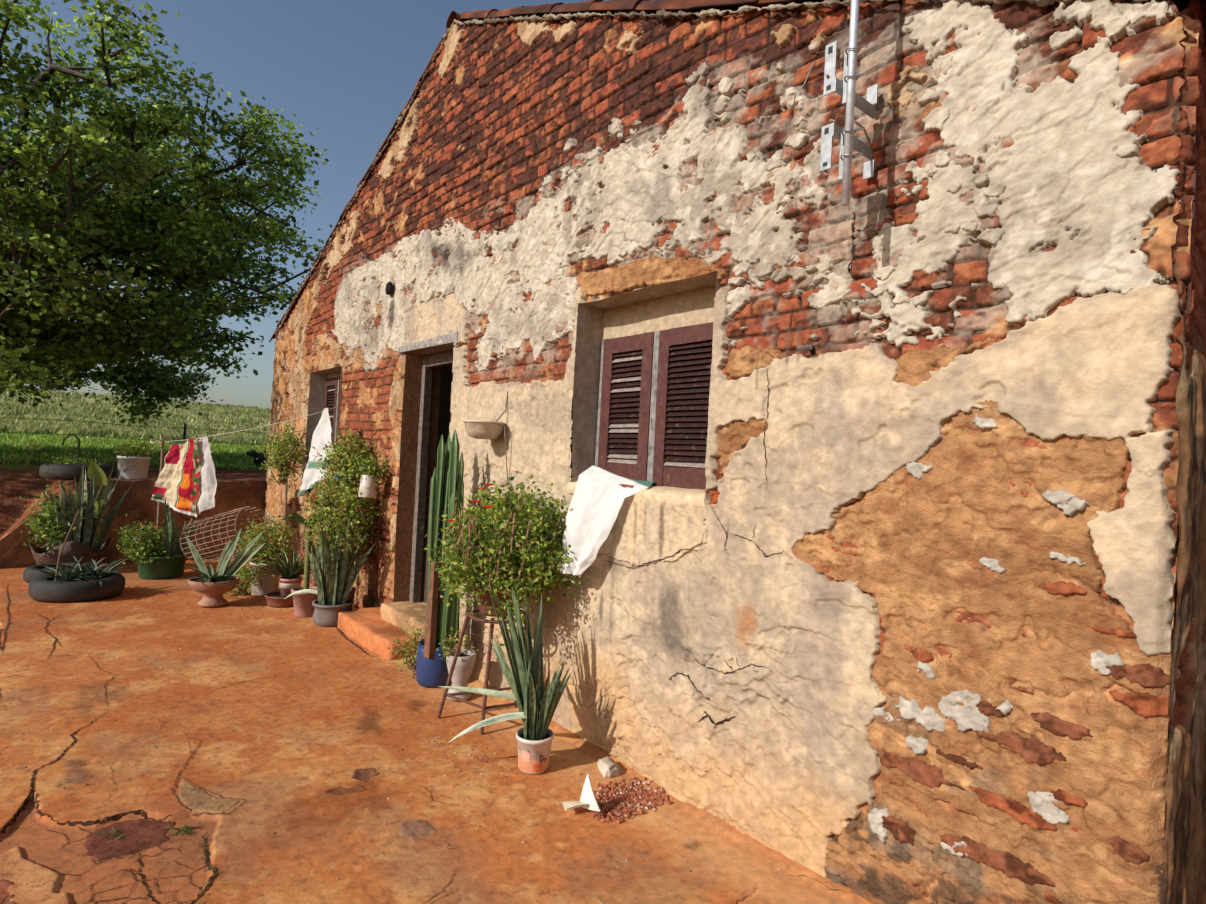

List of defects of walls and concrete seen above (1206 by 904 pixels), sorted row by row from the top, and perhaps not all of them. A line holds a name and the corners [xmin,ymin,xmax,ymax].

flaking render [263,0,1196,567]
crack [0,583,246,904]
spalling [792,400,1175,904]